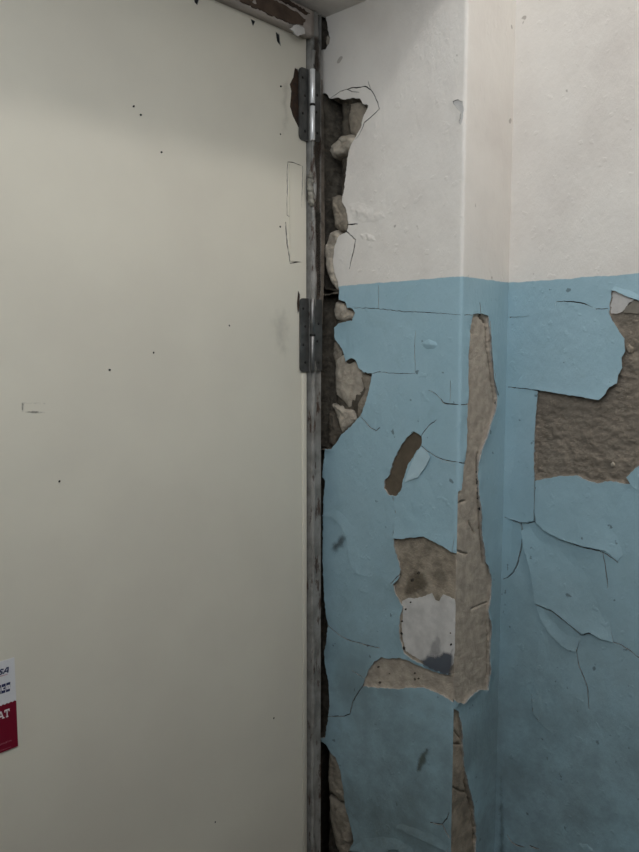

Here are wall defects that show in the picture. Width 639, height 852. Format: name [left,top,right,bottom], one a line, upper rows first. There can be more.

spalling [321,93,373,450]
spalling [363,314,501,852]
spalling [505,286,639,652]
spalling [328,751,414,852]